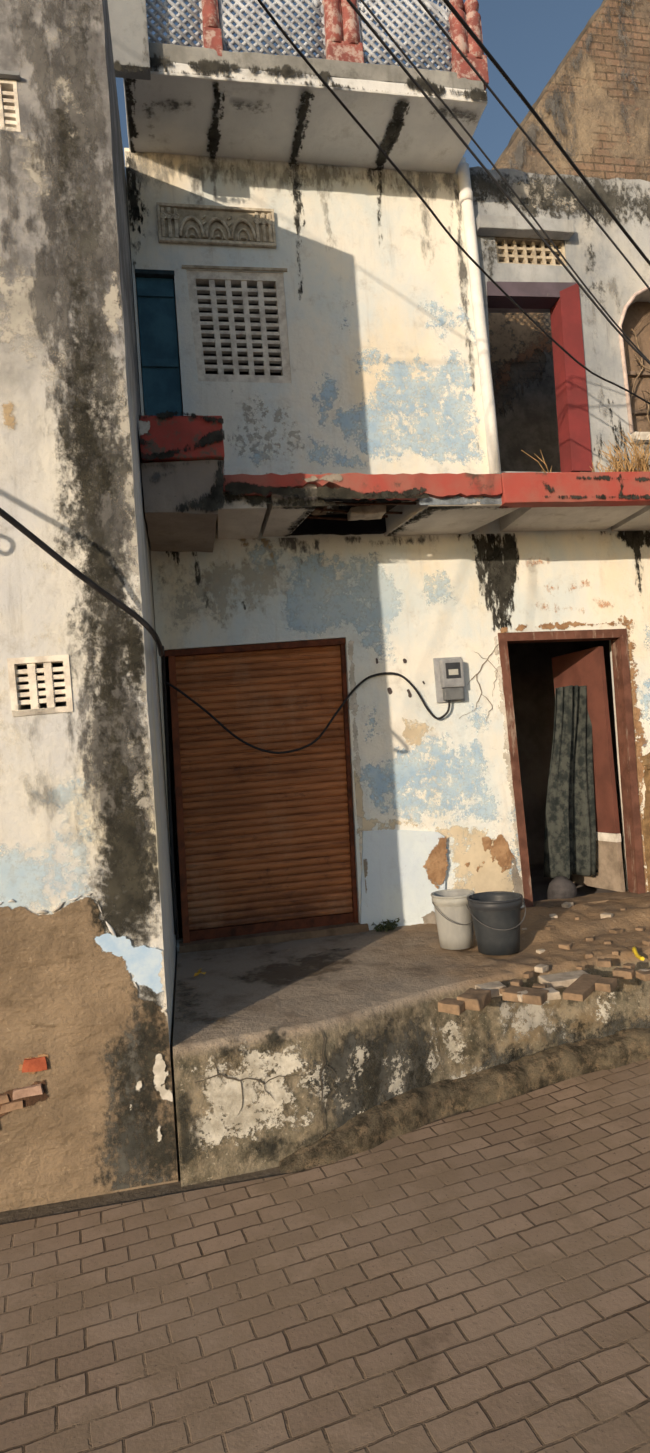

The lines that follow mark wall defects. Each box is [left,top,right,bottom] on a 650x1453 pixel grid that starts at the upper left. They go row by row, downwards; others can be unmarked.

water stain [509,0,638,217]
peeling [102,272,122,332]
water stain [124,38,488,390]
water stain [586,244,620,306]
water stain [0,0,162,946]
peeling [117,301,502,597]
water stain [458,533,519,633]
water stain [488,313,650,500]
water stain [600,530,650,593]
peeling [128,739,154,810]
peeling [0,833,484,1212]
water stain [256,1131,329,1161]